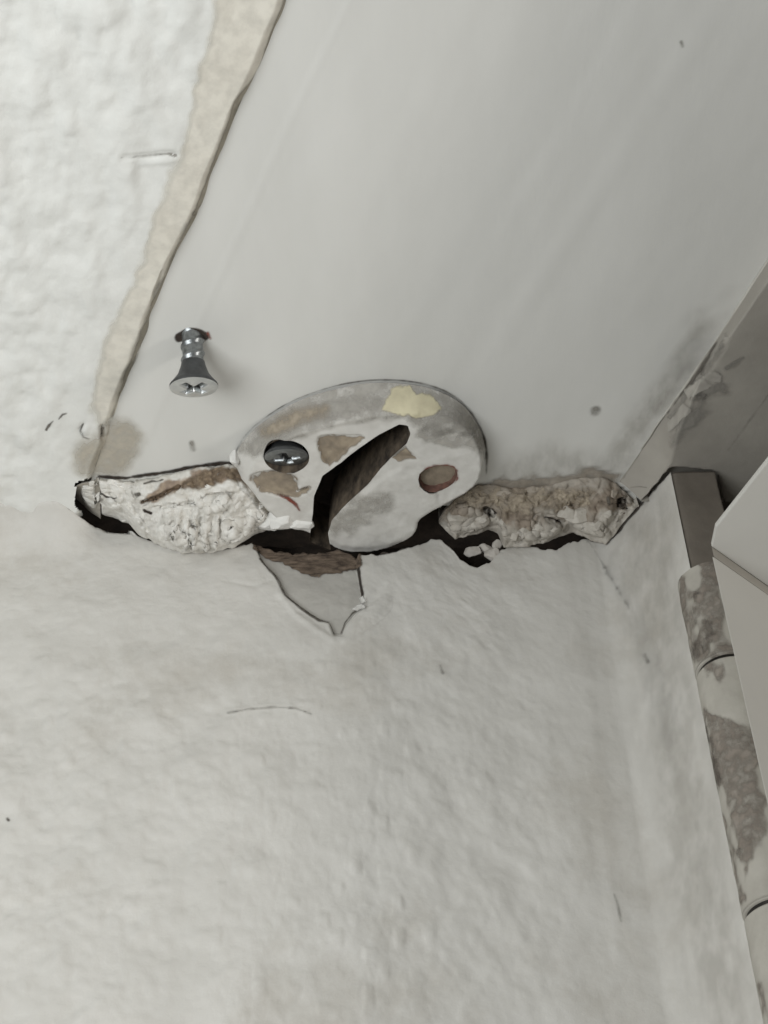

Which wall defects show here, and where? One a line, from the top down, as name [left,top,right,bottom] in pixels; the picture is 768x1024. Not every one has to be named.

spalling [75,464,366,634]
spalling [438,468,639,548]
peeling [679,561,734,679]
peeling [704,709,766,904]